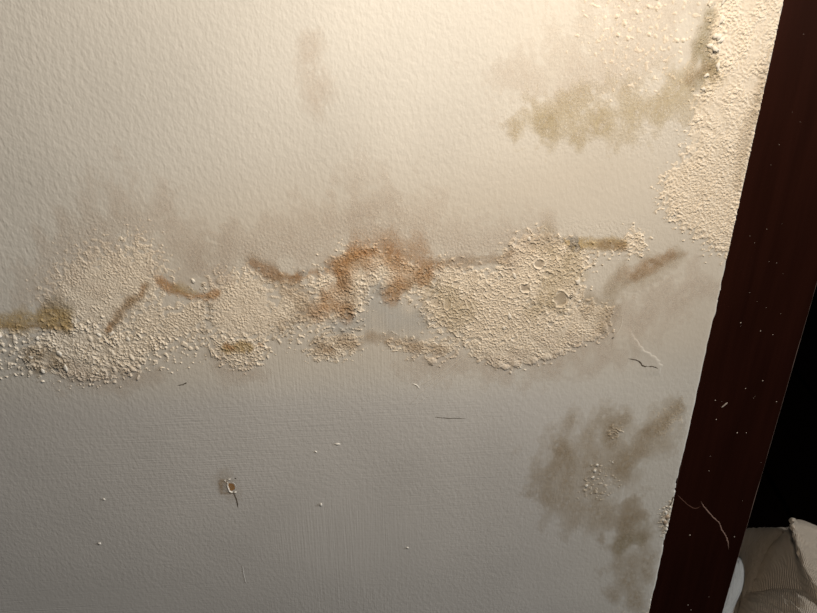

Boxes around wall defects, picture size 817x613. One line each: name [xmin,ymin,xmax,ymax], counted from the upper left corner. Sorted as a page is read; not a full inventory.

water stain [564,239,626,249]